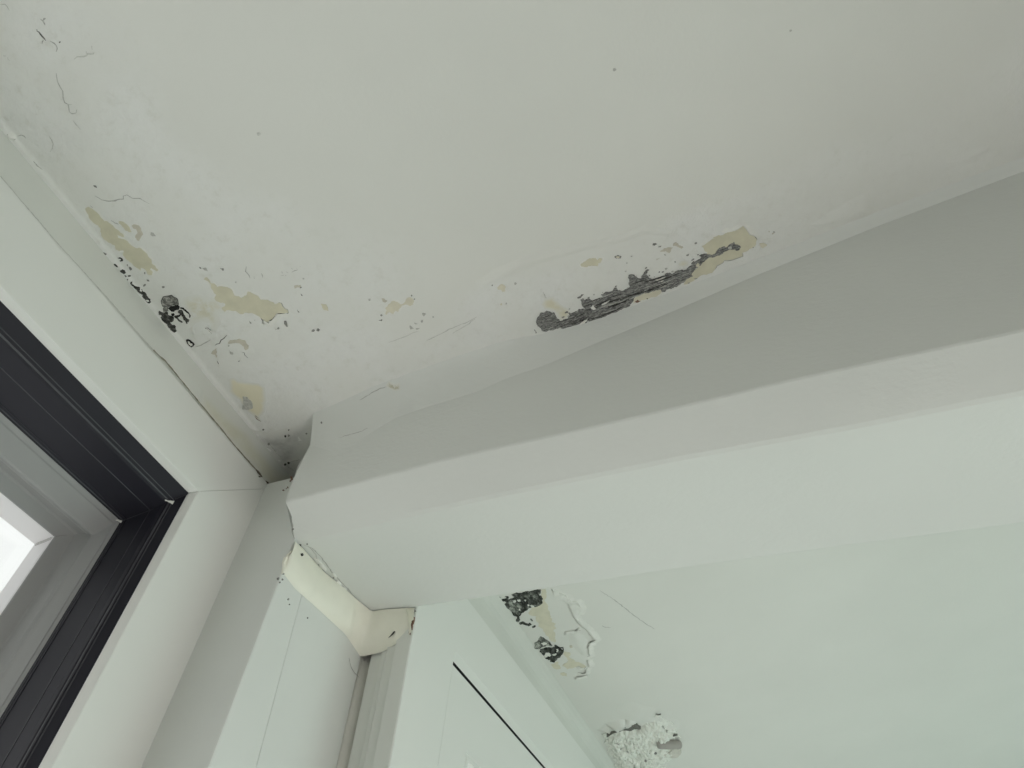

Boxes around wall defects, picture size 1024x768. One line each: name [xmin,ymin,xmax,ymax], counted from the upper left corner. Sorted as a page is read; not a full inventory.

crack [37,18,94,130]
peeling [84,200,195,347]
peeling [199,267,299,329]
spalling [534,222,774,333]
peeling [502,587,602,679]
spalling [597,702,686,768]